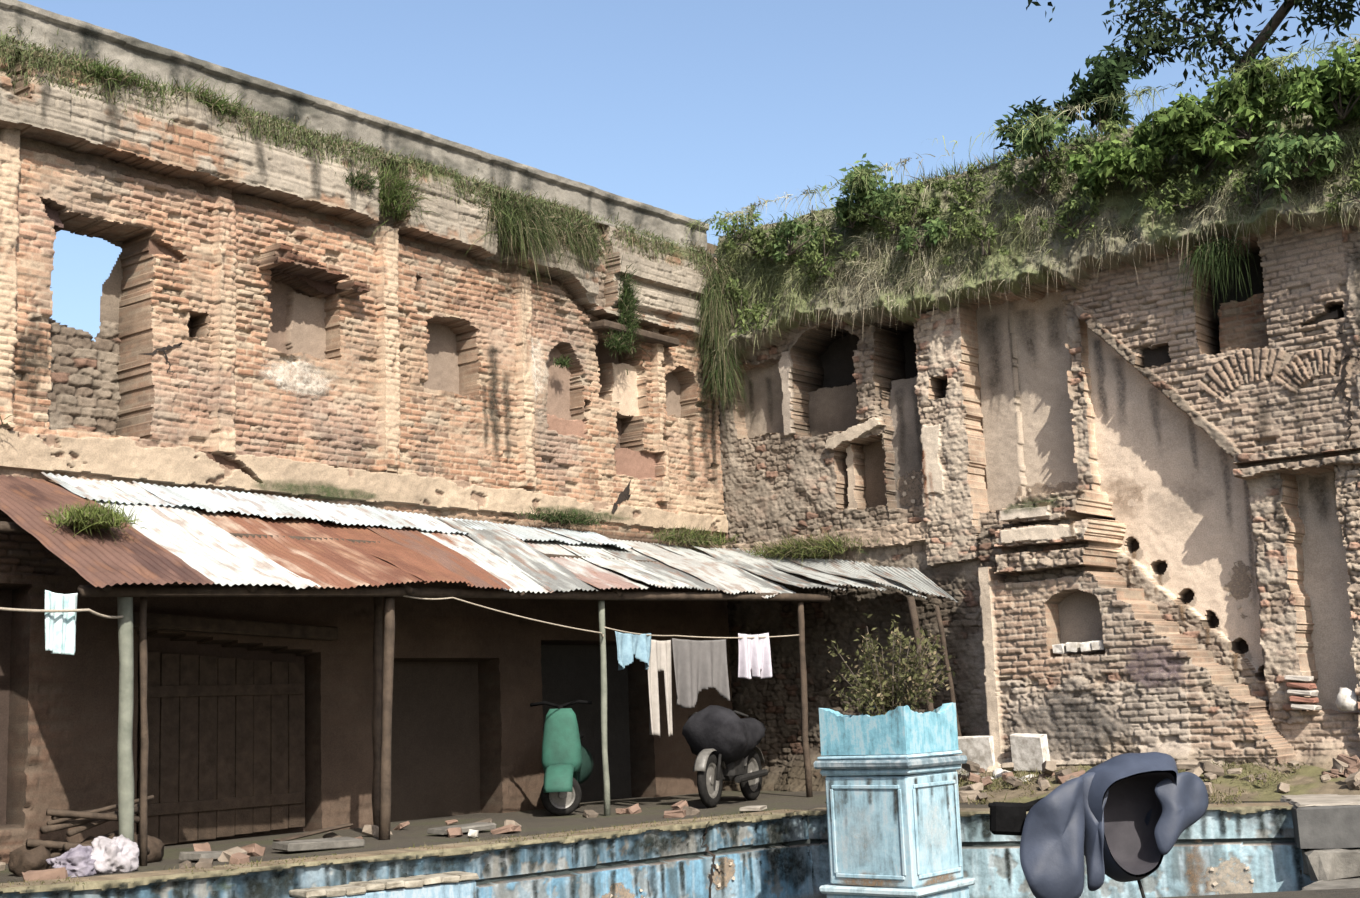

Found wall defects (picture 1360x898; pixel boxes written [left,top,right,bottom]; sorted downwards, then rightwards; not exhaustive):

damp [483,348,510,451]
crack [1332,317,1360,441]
damp [326,814,828,898]
flaking render [602,882,645,898]
flaking render [1195,857,1254,895]